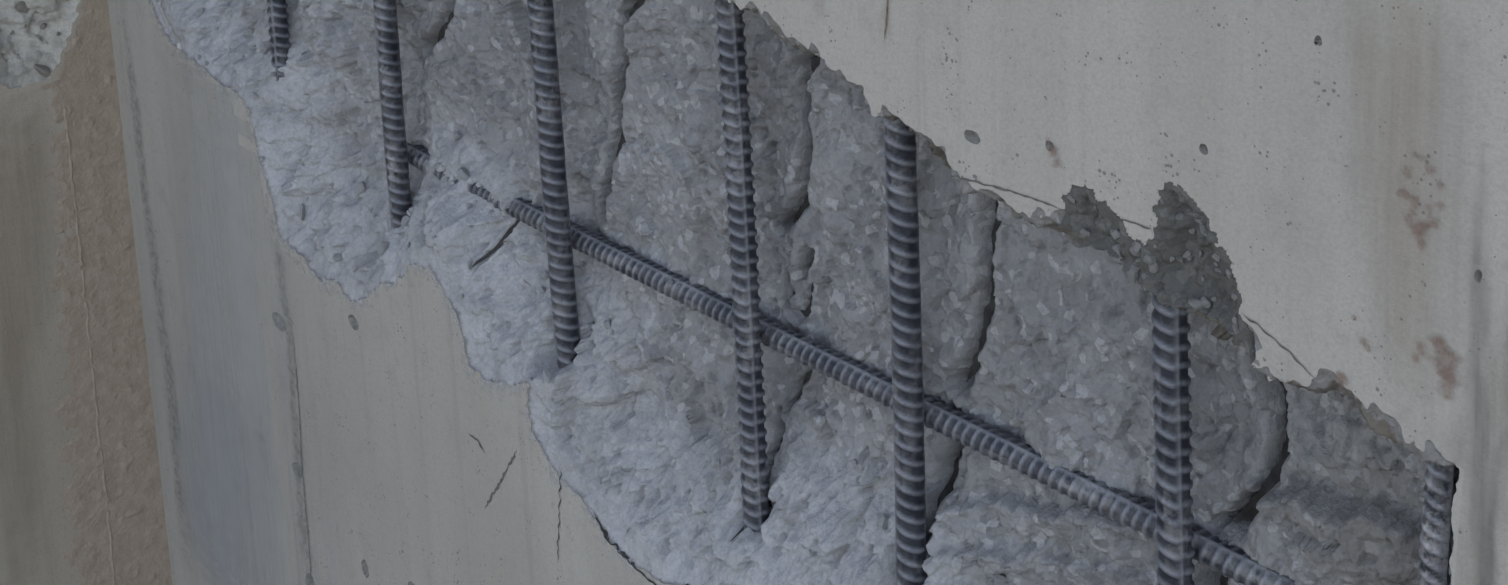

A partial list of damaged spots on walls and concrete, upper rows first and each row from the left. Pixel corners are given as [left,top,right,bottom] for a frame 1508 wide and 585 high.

spalling [0,0,81,89]
spalling [148,0,900,585]
spalling [884,118,1460,585]